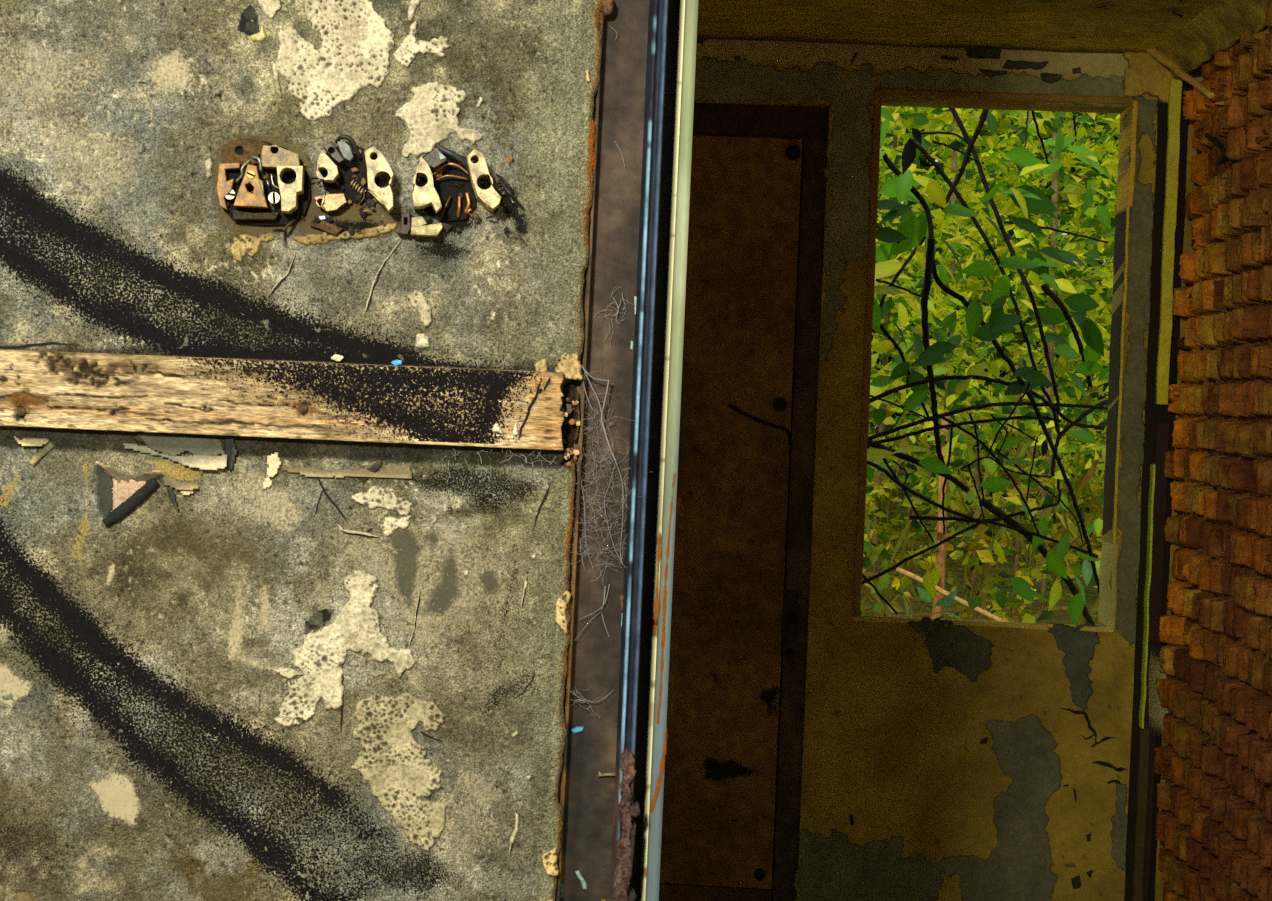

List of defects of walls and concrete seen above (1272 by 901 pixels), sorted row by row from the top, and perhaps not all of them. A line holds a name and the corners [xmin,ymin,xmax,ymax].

peeling [237,0,450,121]
peeling [395,81,483,158]
peeling [271,569,447,851]
corrosion [612,474,675,901]
peeling [509,813,519,844]
peeling [793,713,1094,901]
peeling [1110,783,1128,875]